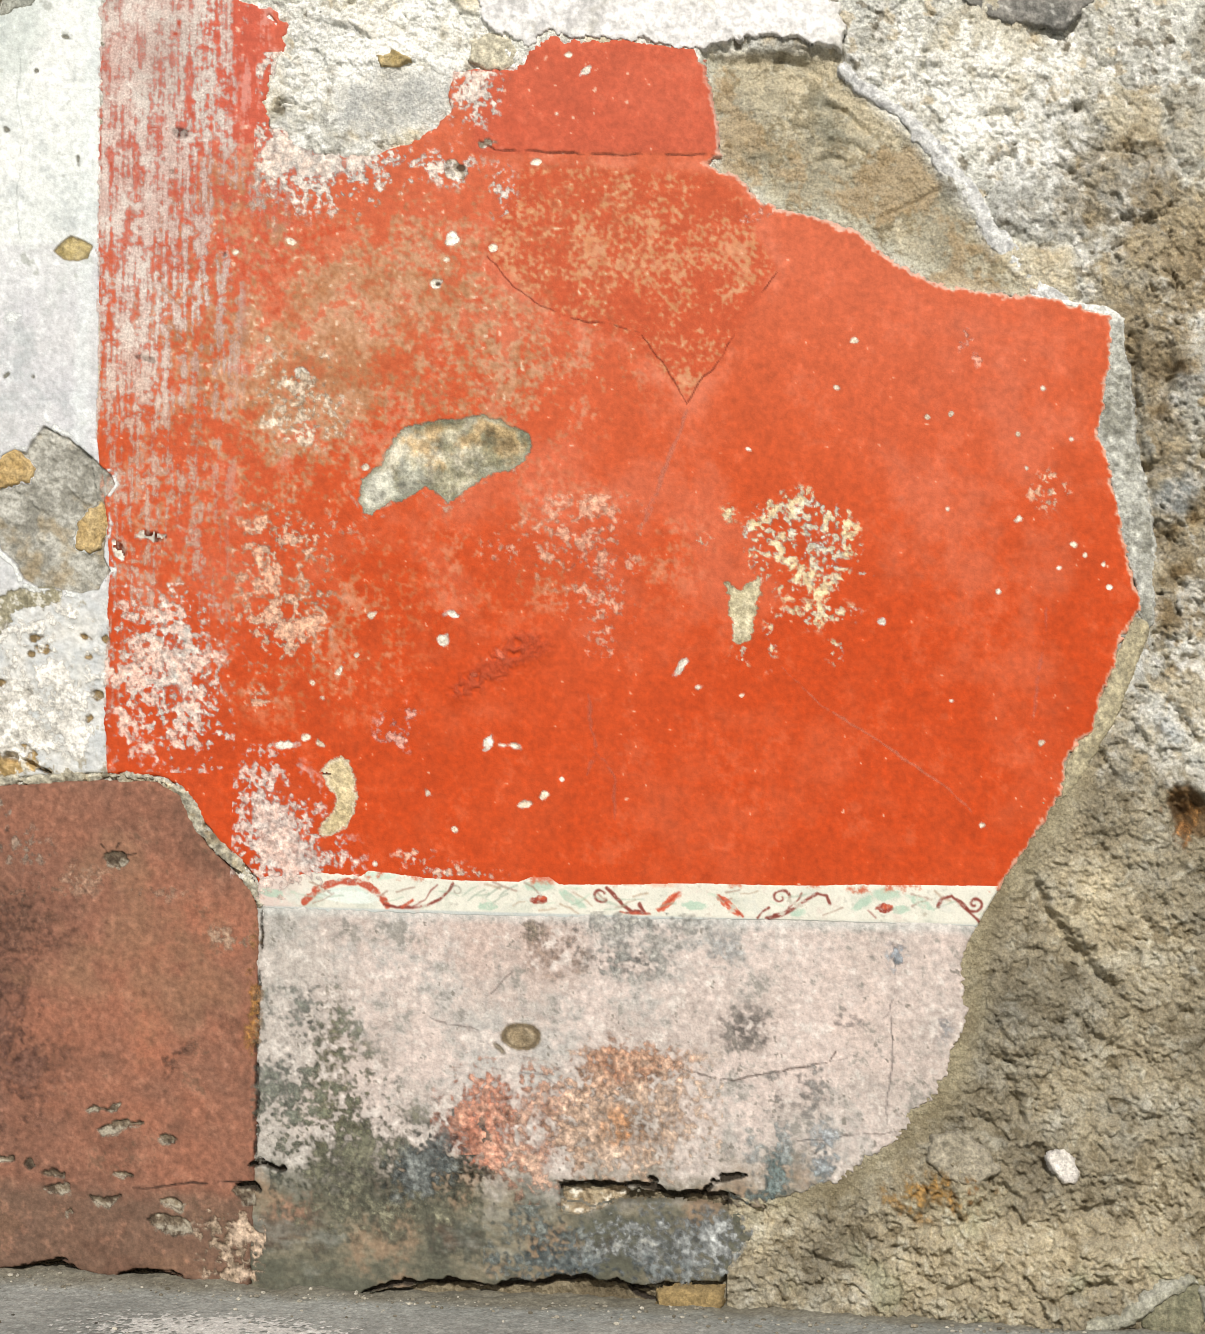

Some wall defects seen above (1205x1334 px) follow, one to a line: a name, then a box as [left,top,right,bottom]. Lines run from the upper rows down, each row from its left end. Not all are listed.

crack [487,145,703,156]
peeling [492,172,514,214]
peeling [0,0,503,777]
spalling [359,414,532,515]
peeling [1028,473,1065,509]
peeling [722,487,864,660]
peeling [230,734,377,900]
peeling [396,848,493,878]
peeling [87,1102,144,1136]
crack [560,1172,748,1204]
peeling [147,1181,266,1283]
crack [362,1273,656,1300]